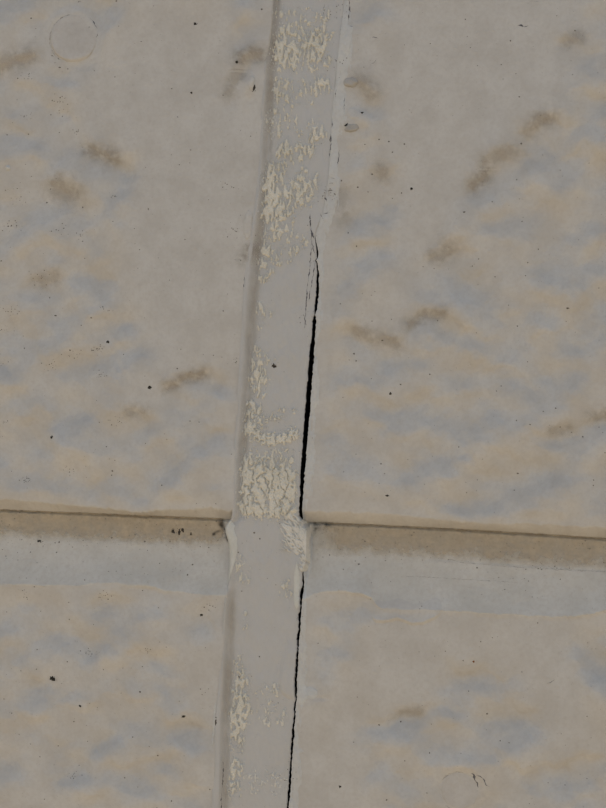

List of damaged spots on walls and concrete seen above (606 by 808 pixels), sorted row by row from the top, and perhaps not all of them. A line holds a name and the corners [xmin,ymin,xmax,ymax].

crack [299,122,340,519]
crack [287,573,304,808]